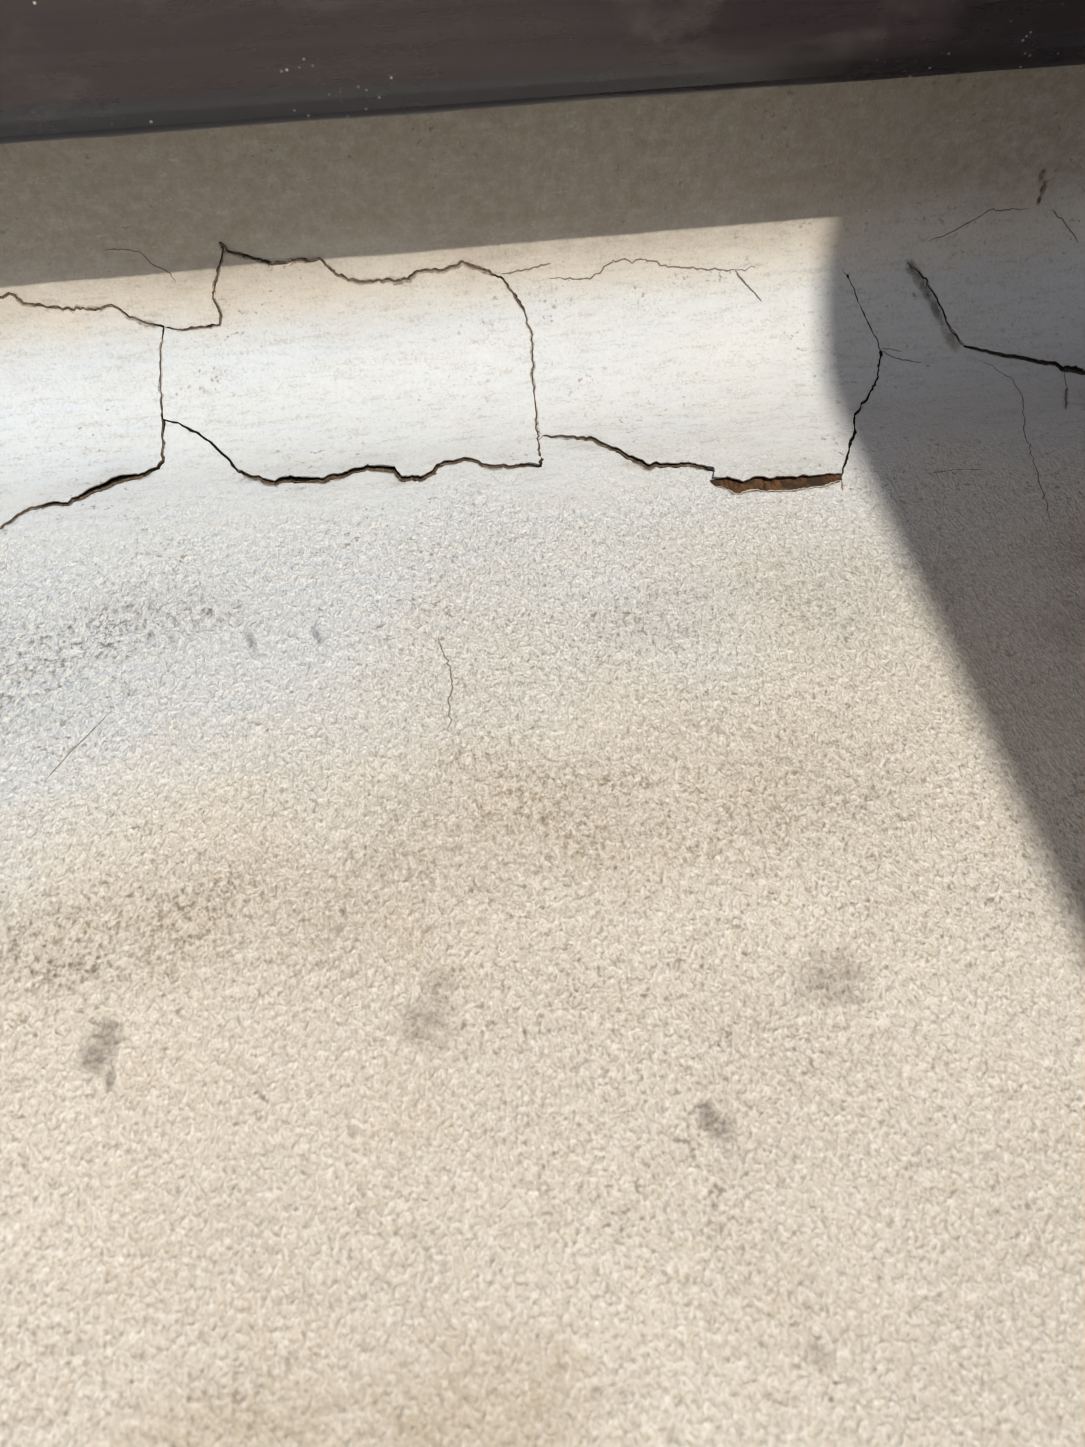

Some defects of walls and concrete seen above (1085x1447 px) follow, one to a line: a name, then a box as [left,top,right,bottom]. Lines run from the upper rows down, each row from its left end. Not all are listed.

crack [0,242,762,529]
crack [841,269,921,491]
crack [908,208,1085,523]